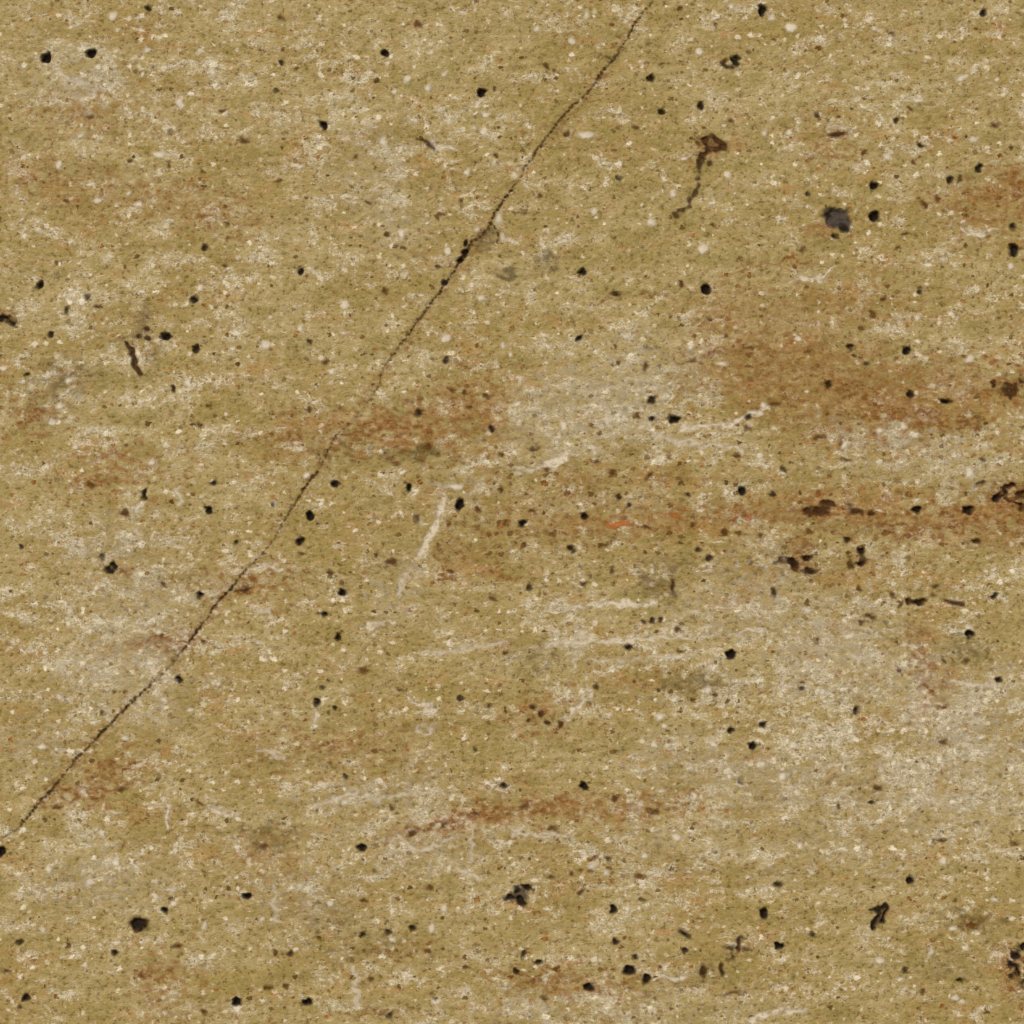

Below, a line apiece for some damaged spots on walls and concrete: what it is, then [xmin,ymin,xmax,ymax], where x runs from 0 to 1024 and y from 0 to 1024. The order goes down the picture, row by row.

crack [374,4,651,392]
crack [20,435,337,826]